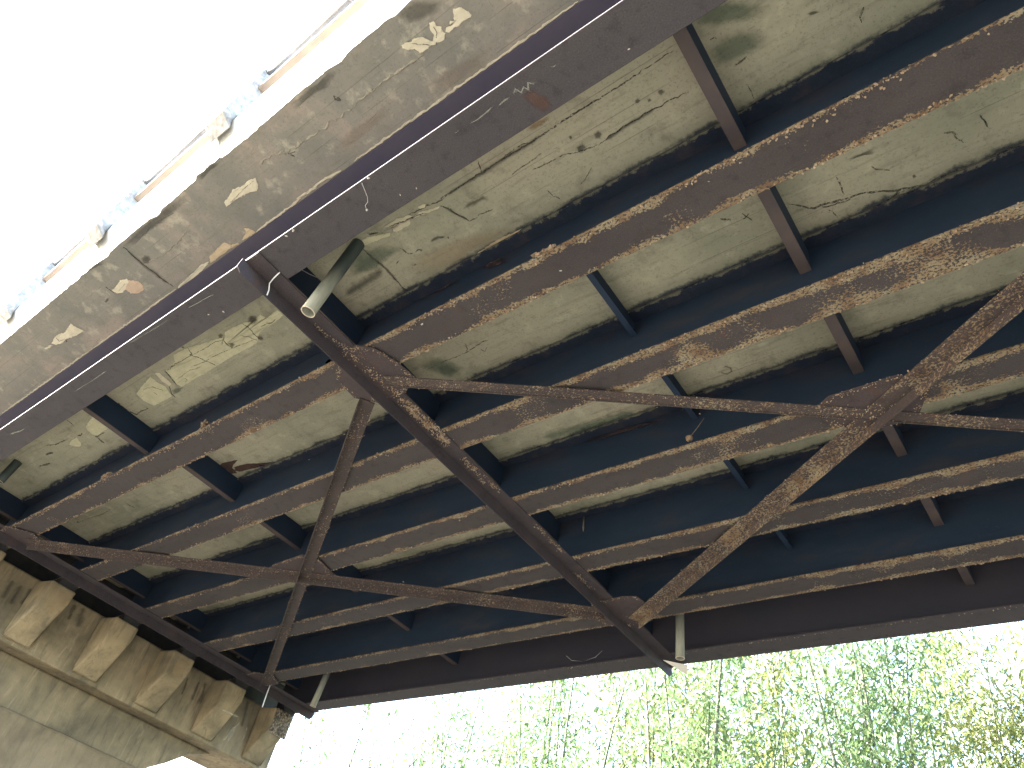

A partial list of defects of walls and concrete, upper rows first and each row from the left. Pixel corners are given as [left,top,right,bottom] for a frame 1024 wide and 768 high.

spalling [354,1,578,162]
crack [436,51,684,222]
crack [792,131,1023,216]
spalling [2,170,341,415]
corrosion [221,460,272,474]